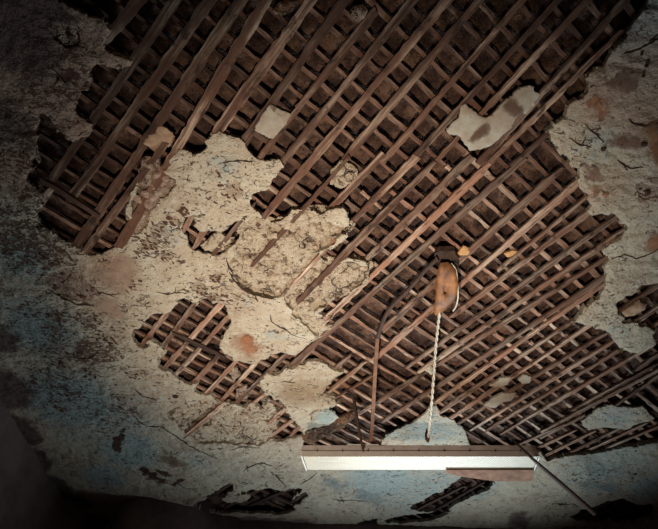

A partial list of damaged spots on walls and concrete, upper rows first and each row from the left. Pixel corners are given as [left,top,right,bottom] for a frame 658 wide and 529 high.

crack [569,126,604,148]
water stain [610,137,642,149]
crack [629,119,658,128]
spalling [126,154,195,264]
peeling [36,225,74,248]
spalling [33,253,99,303]
spalling [182,203,375,338]
crack [130,410,220,461]
spalling [168,391,286,445]